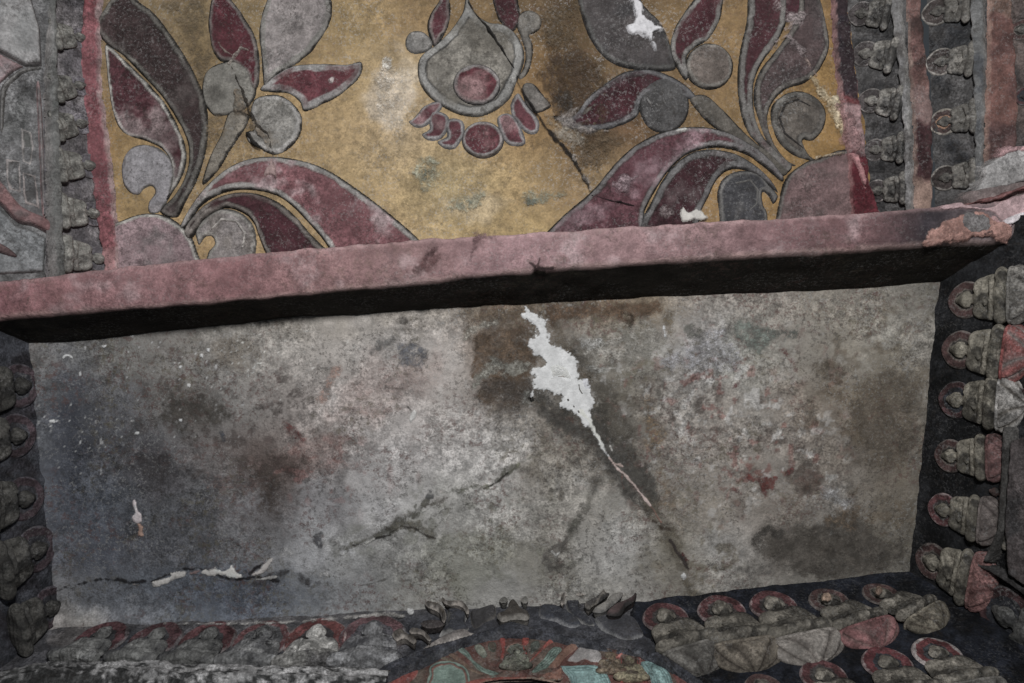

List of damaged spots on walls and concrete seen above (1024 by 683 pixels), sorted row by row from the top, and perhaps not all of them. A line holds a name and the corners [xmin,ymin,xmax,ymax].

spalling [626,0,665,51]
crack [468,2,634,206]
peeling [612,174,637,192]
spalling [659,205,708,222]
flaking render [923,146,1024,246]
spalling [521,306,609,457]
spalling [132,500,144,536]
crack [343,452,544,550]
damp [463,309,699,596]
crack [608,445,689,580]
crack [55,563,310,592]
spalling [152,548,293,587]